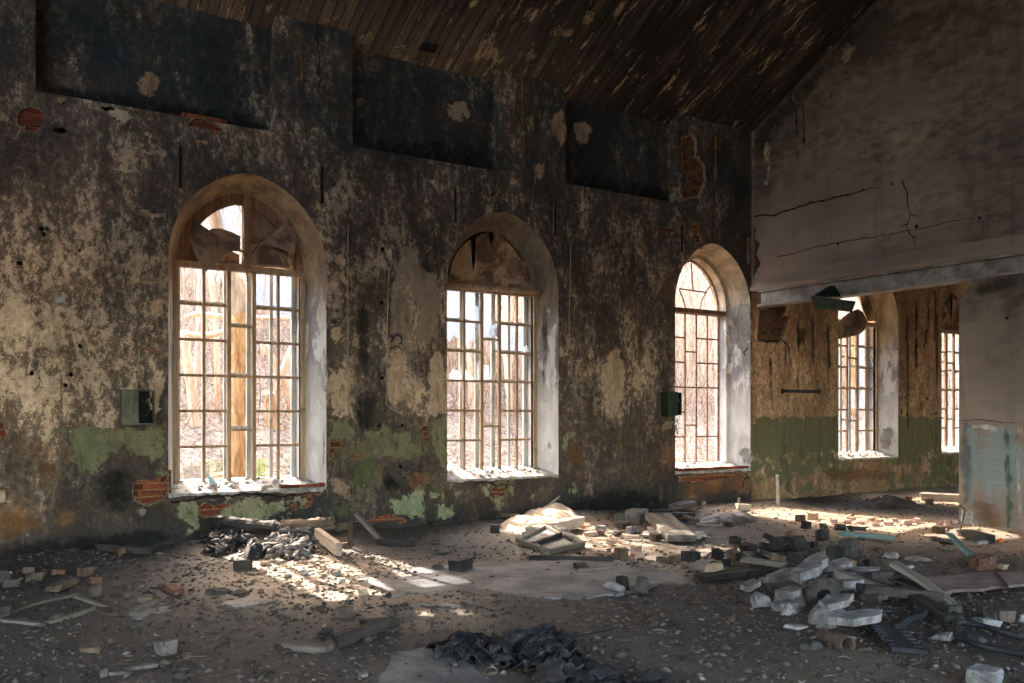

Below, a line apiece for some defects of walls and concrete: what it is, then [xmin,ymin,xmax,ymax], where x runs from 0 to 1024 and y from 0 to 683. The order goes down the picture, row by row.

spalling [16,95,67,134]
flaking render [135,71,161,97]
spalling [181,112,227,151]
flaking render [446,101,470,122]
peeling [550,109,593,150]
spalling [681,133,707,202]
crack [754,181,1019,257]
peeling [129,255,165,348]
peeling [319,223,455,524]
leakage [785,317,830,384]
leakage [906,299,938,429]
peeling [56,368,351,536]